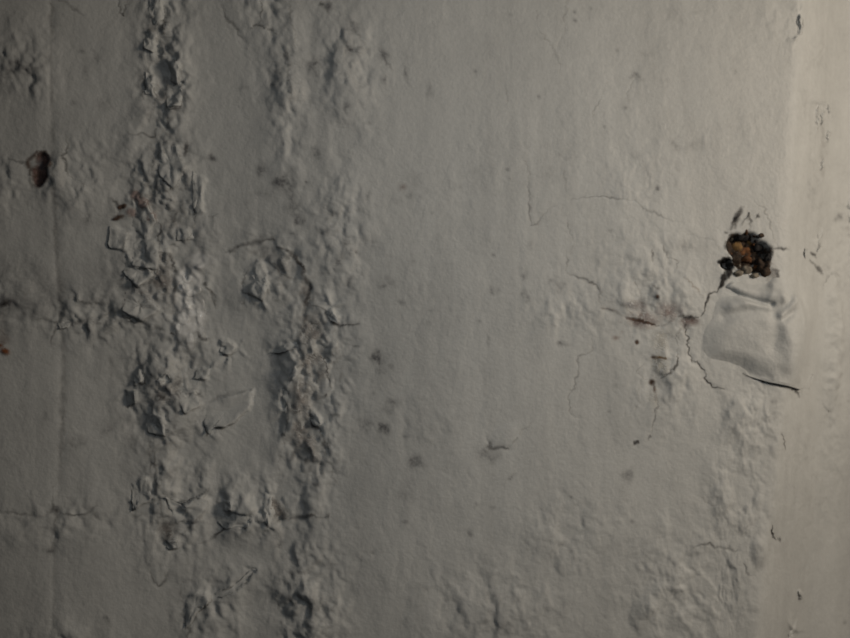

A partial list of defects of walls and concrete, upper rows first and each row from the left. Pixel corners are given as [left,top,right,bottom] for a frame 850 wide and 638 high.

peeling [108,191,178,322]
peeling [242,261,270,302]
crack [627,317,655,325]
crack [669,285,721,388]
peeling [125,369,145,408]